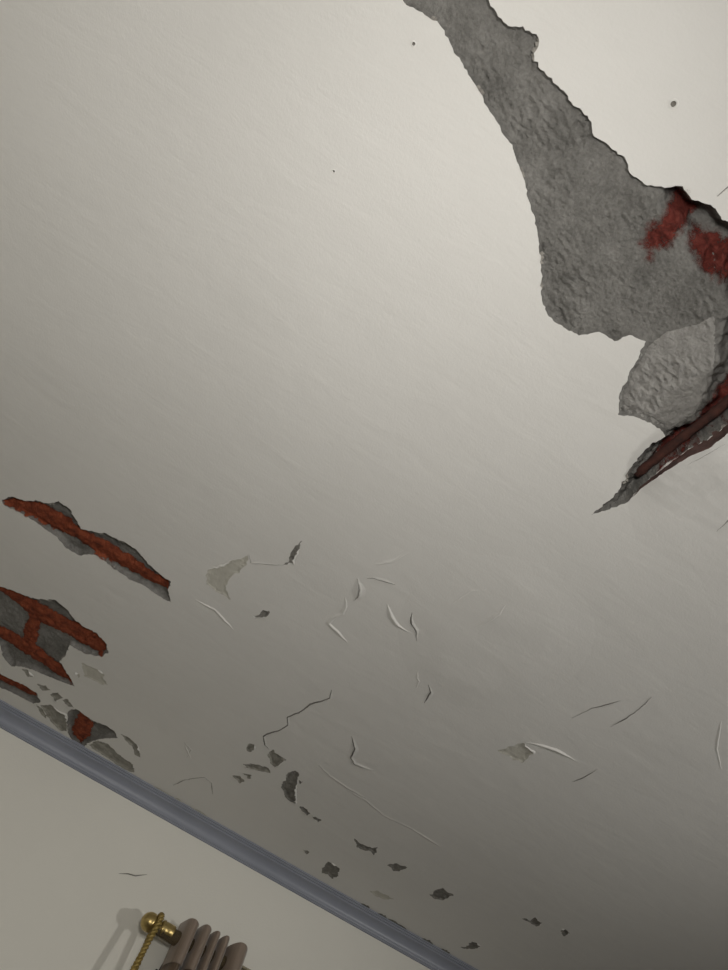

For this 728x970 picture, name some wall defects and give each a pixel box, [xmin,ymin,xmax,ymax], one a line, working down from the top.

spalling [403,0,728,514]
rust [638,186,728,283]
crack [716,183,728,198]
rust [653,373,728,471]
rust [1,497,169,590]
spalling [2,497,171,602]
peeling [283,541,302,565]
rust [0,674,37,696]
rust [0,587,106,685]
spalling [0,591,140,772]
peeling [233,744,322,822]
peeling [322,862,340,879]